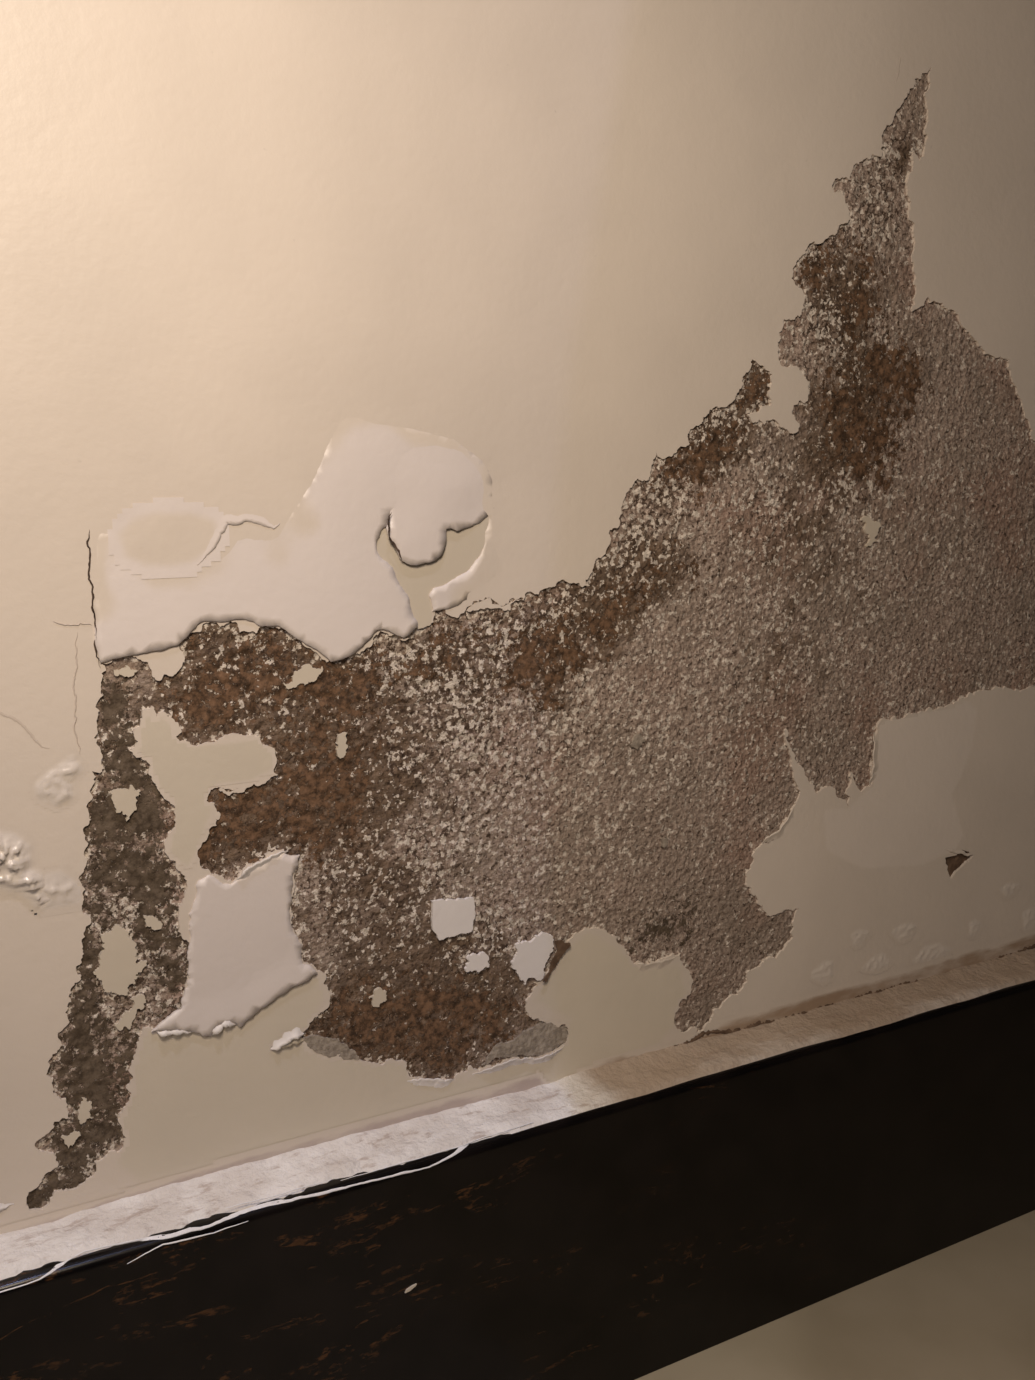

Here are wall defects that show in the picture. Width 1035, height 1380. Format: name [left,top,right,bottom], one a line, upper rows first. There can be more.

peeling [377,446,489,629]
spalling [944,848,973,877]
peeling [151,853,317,1037]
spalling [472,1045,565,1075]
spalling [108,1078,128,1093]
spalling [113,1091,131,1120]
spalling [57,1104,81,1148]
spalling [35,1130,61,1155]
spalling [79,1135,125,1179]
spalling [36,1165,72,1192]